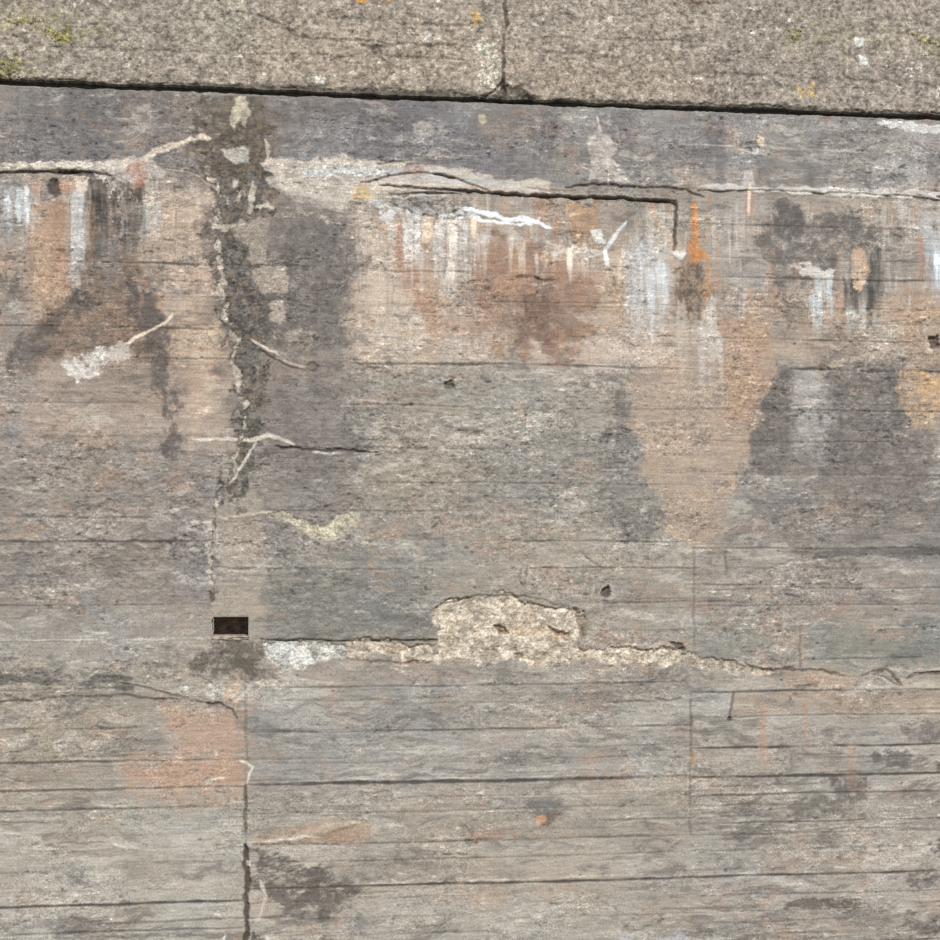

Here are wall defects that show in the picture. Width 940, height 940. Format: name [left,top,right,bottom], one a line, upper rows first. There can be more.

crack [235,0,535,101]
leakage [0,174,189,471]
crack [0,132,217,203]
leakage [154,93,726,513]
crack [360,170,940,261]
corrosion [684,192,714,318]
leakage [746,193,886,348]
corrosion [621,307,779,549]
leakage [744,354,938,522]
crack [190,432,380,621]
spalling [170,588,775,705]
spalling [599,583,626,601]